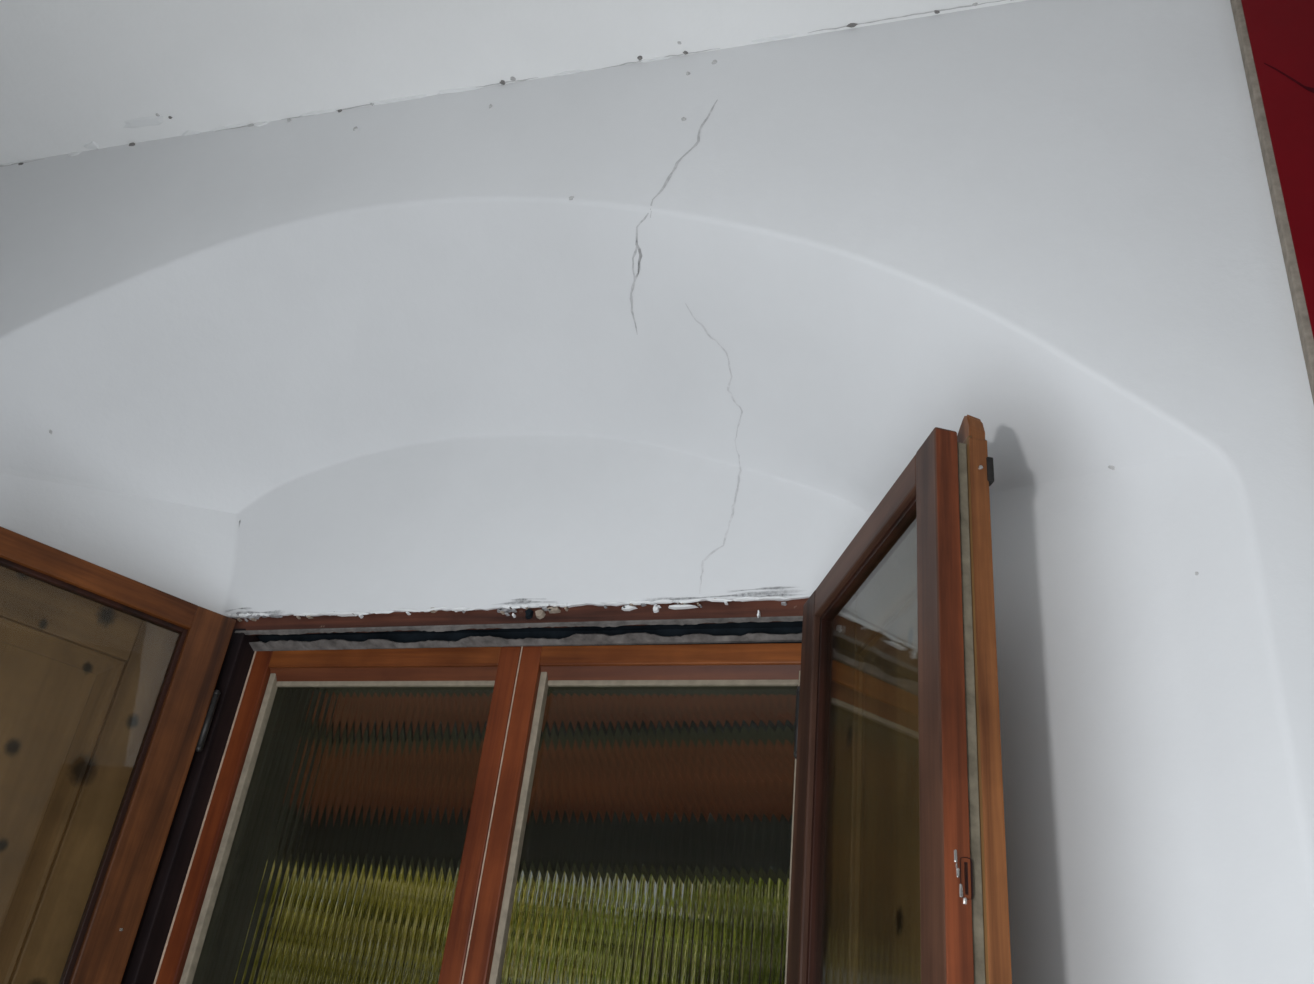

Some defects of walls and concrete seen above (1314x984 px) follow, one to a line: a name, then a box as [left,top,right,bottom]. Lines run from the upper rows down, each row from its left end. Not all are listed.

crack [752,0,1004,42]
crack [0,41,717,166]
crack [630,100,717,333]
crack [685,303,743,594]
spalling [497,603,568,619]
spalling [598,596,787,618]